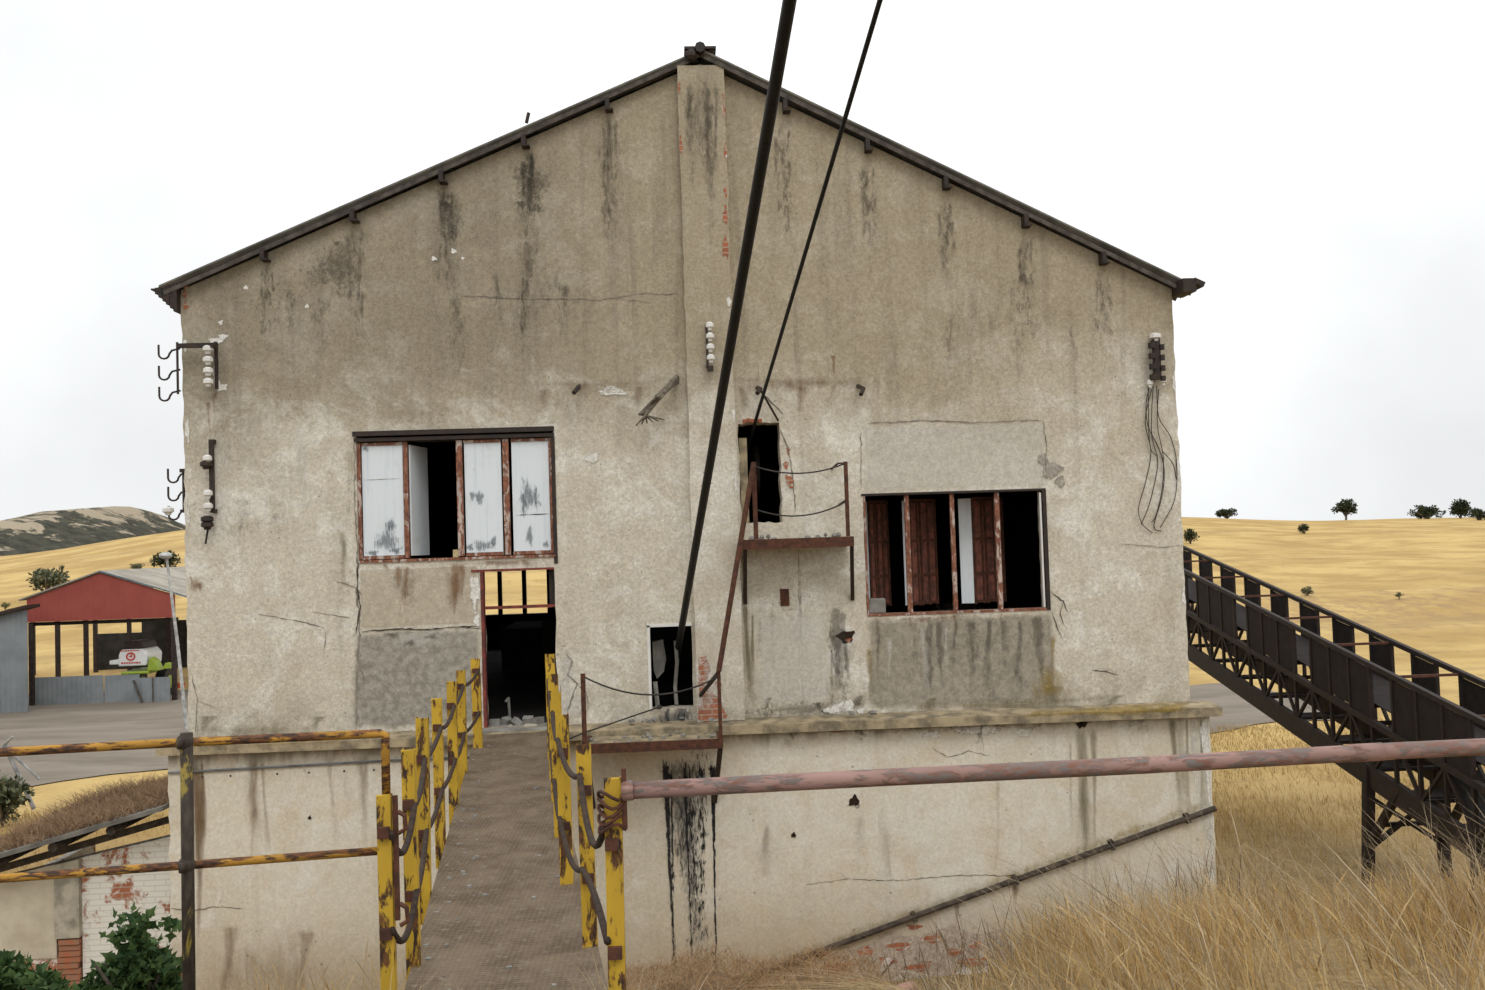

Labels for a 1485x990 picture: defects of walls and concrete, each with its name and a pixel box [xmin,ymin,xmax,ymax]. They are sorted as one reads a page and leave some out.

crack [460,293,671,302]
leakage [662,751,717,973]
spalling [812,924,1014,983]